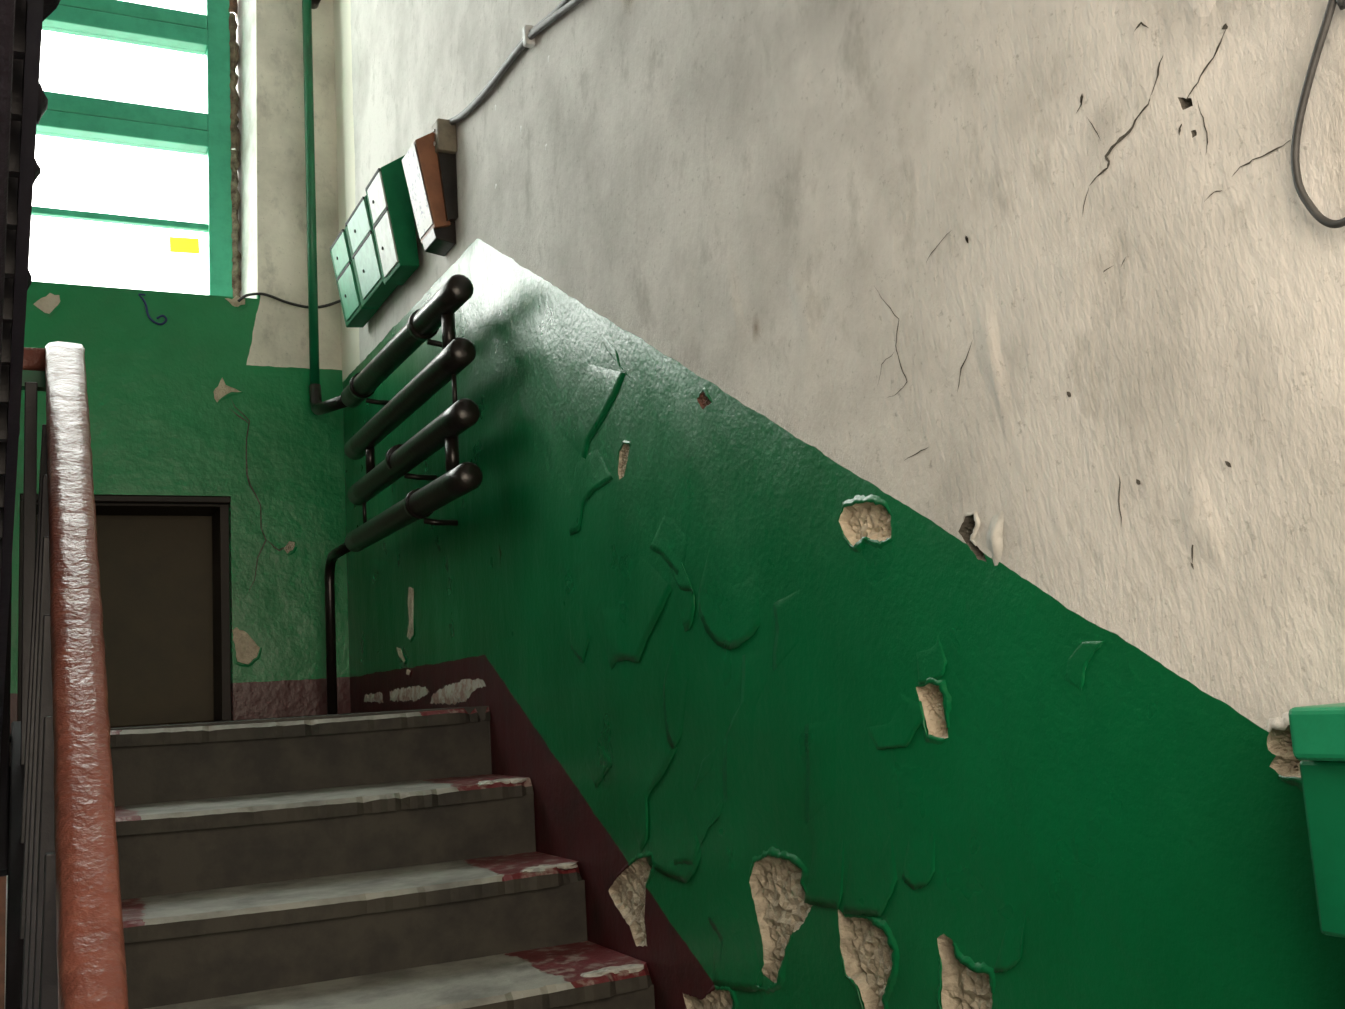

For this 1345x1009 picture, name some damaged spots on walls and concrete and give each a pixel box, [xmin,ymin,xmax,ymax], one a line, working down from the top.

peeling [33,293,62,318]
peeling [214,378,243,403]
peeling [558,335,631,536]
spalling [839,495,892,553]
peeling [232,627,262,667]
peeling [364,587,486,705]
spalling [1266,712,1303,792]
spalling [580,964,644,977]
spalling [608,850,655,947]
spalling [683,985,739,1009]
spalling [748,846,812,994]
spalling [838,909,900,1009]